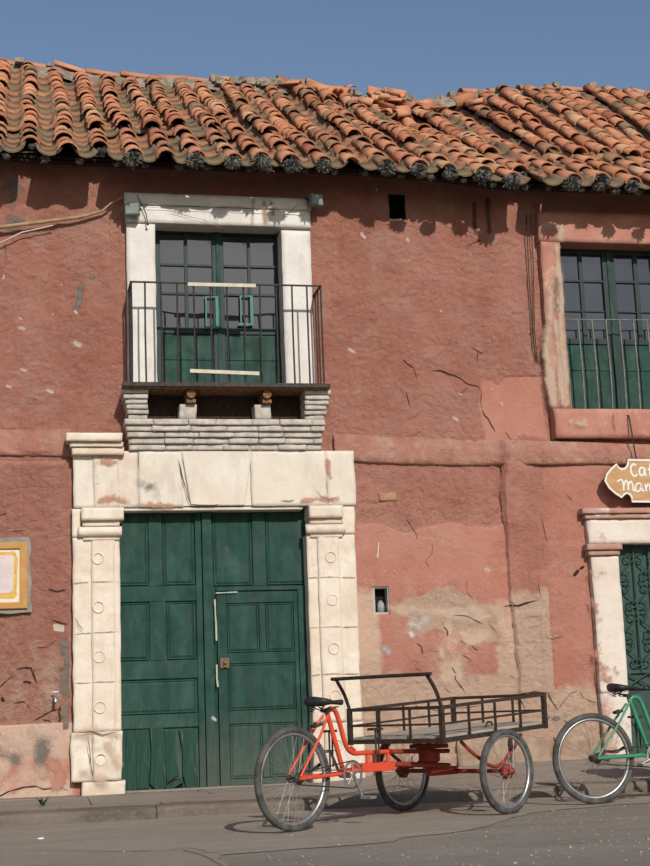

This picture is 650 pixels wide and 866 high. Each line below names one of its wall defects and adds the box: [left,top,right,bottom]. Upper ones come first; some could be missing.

crack [403,360,511,440]
flaking render [390,604,500,645]
flaking render [439,647,463,684]
crack [0,618,115,780]
leakage [0,728,67,791]
crack [0,785,69,797]